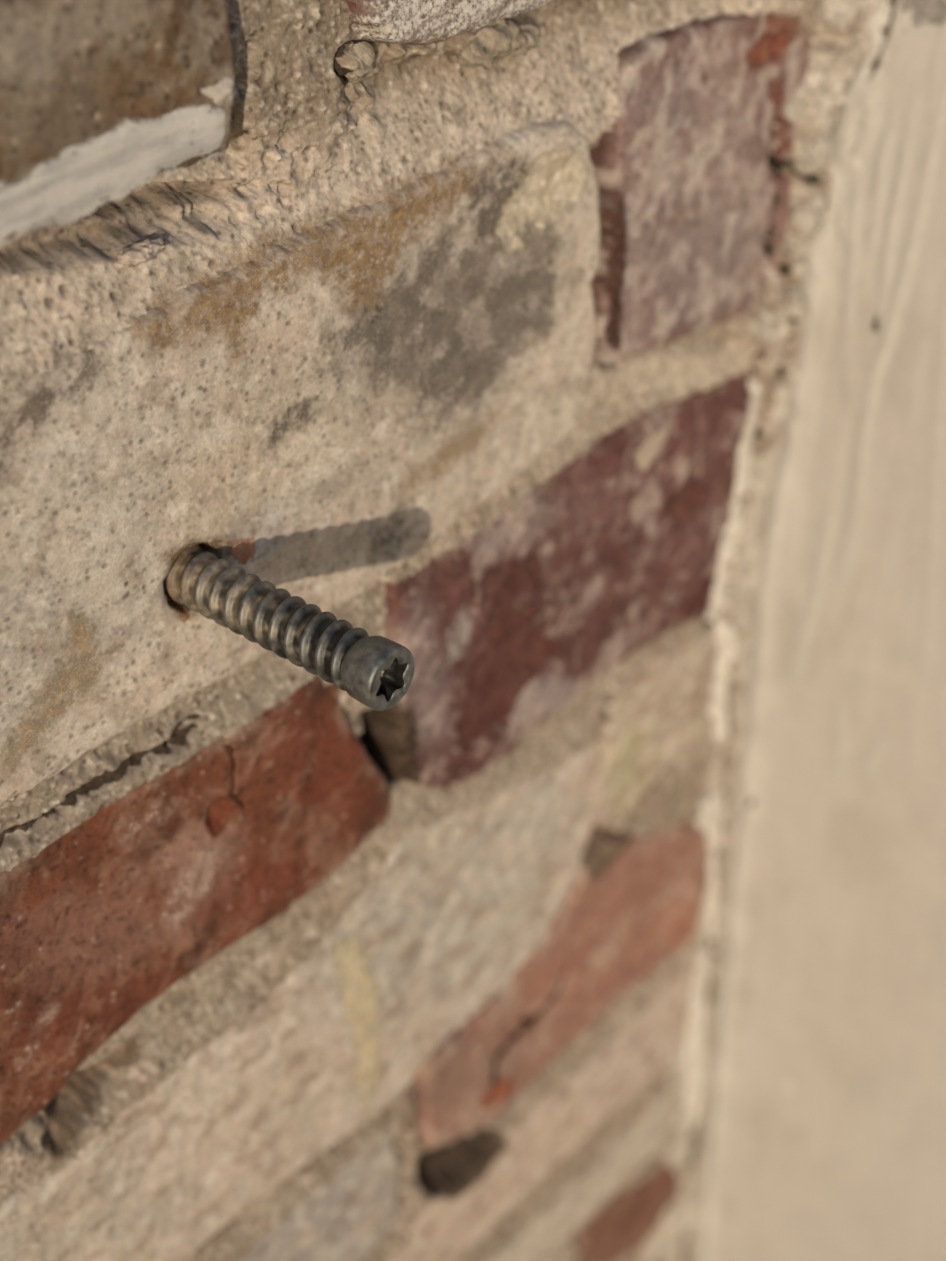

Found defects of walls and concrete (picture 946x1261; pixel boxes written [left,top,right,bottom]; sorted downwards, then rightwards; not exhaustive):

spalling [746,26,799,69]
peeling [898,0,946,30]
spalling [767,58,836,186]
crack [0,714,200,846]
crack [227,744,244,809]
crack [492,965,568,1086]